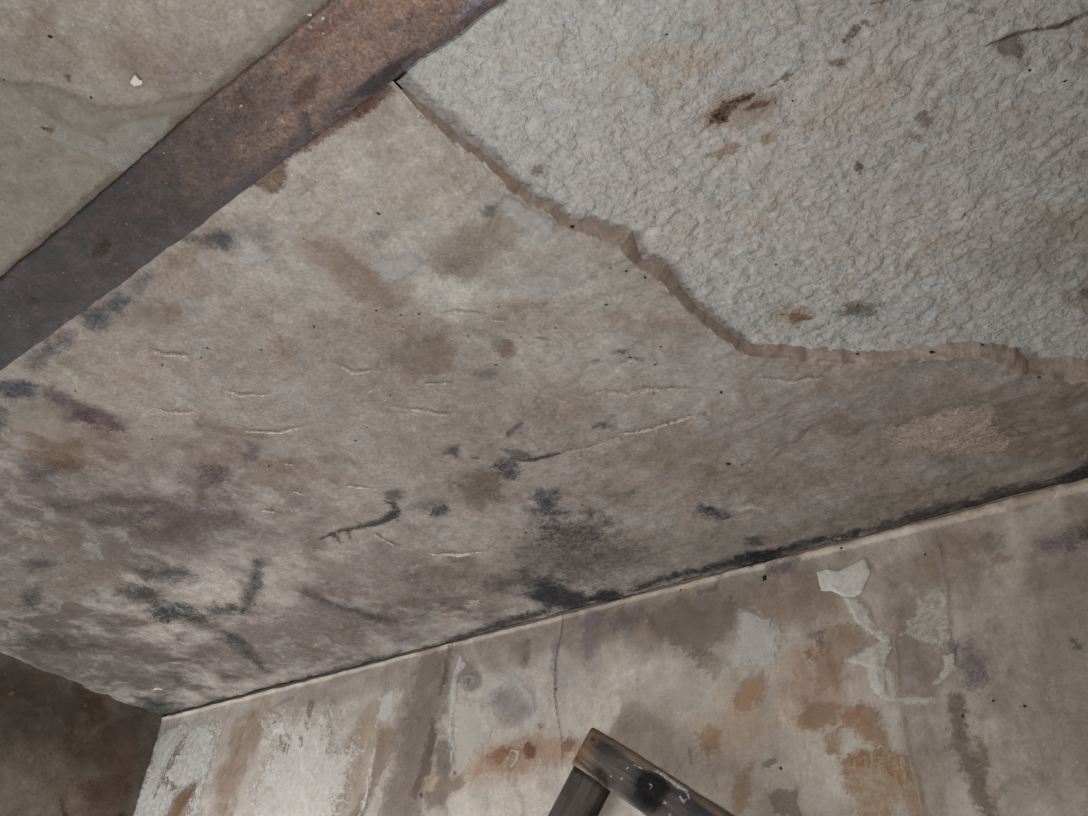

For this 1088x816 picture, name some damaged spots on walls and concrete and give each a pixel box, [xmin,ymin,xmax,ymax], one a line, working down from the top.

corrosion [0,0,329,276]
corrosion [254,85,395,194]
corrosion [709,93,776,126]
mould [0,381,124,432]
peeling [1006,489,1055,512]
damp [120,561,263,625]
damp [237,653,399,696]
crack [553,614,563,770]
damp [410,399,1088,816]
peeling [817,558,955,705]
damp [80,698,223,816]
damp [245,690,396,816]